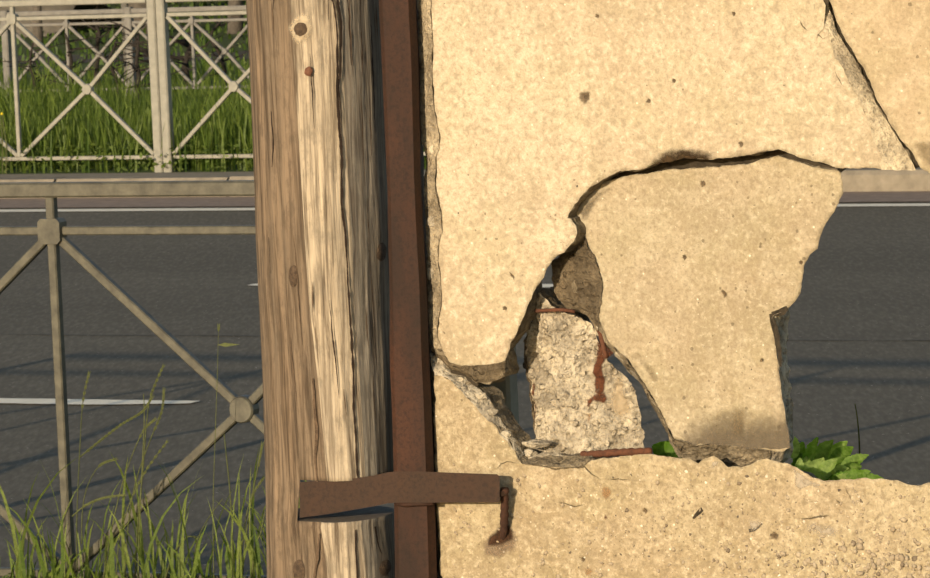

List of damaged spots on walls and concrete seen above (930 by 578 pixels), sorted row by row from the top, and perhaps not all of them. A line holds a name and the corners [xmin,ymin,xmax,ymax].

crack [801,0,887,116]
crack [611,150,835,180]
spalling [417,0,653,468]
rust [587,342,613,417]
spalling [534,237,771,467]
rust [489,525,512,553]